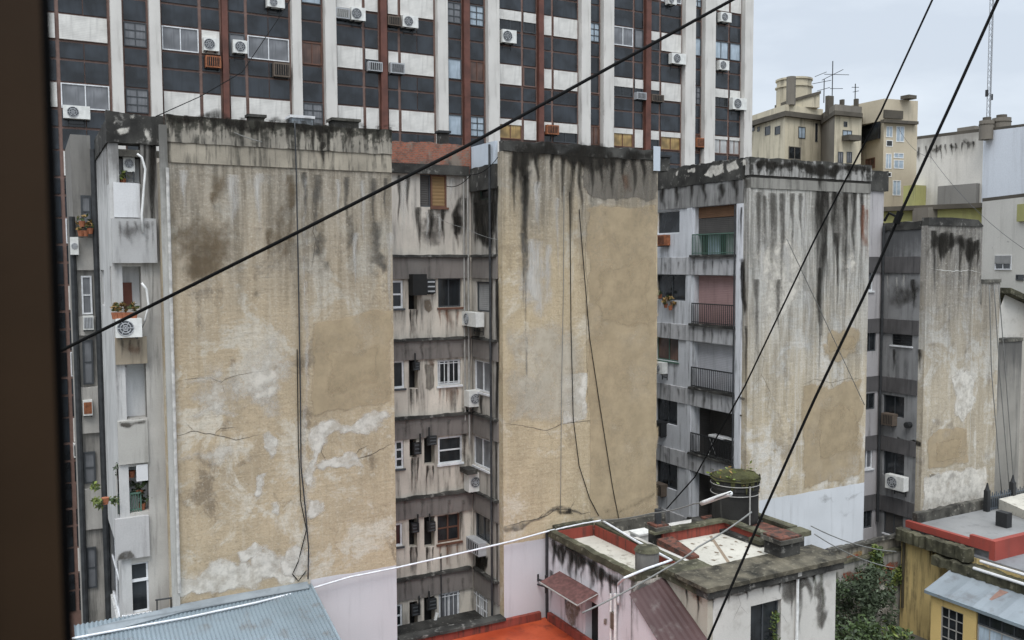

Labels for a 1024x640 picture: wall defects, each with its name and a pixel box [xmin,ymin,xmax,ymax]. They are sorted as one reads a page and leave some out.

damp [168,114,334,161]
damp [372,176,498,254]
damp [512,154,646,308]
damp [719,164,865,321]
damp [491,279,499,419]
crack [177,427,256,440]
flaking render [303,411,388,486]
flaking render [307,500,324,518]
crack [506,501,588,527]
flaking render [180,542,310,597]
damp [550,540,618,593]
damp [729,573,827,628]